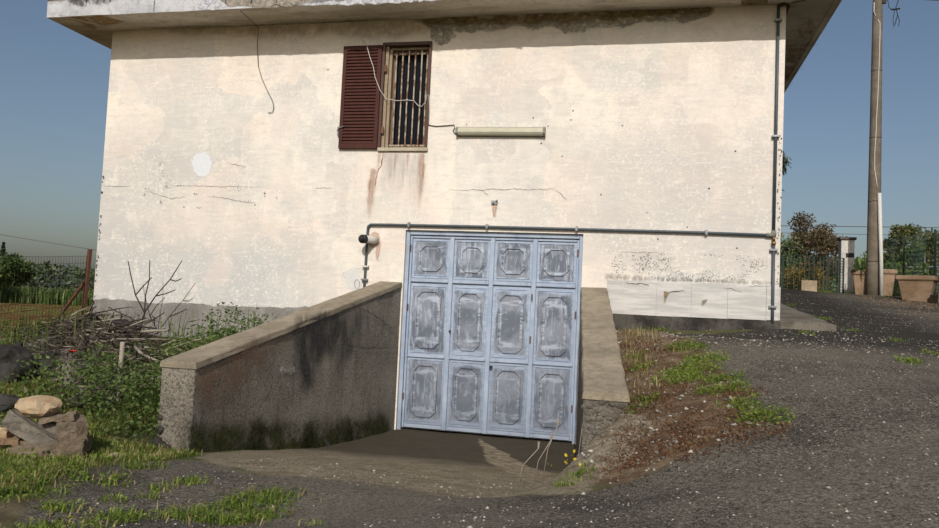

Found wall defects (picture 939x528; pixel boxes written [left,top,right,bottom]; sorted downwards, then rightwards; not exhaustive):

spalling [198,0,434,10]
peeling [611,252,779,284]
water stain [296,315,357,385]